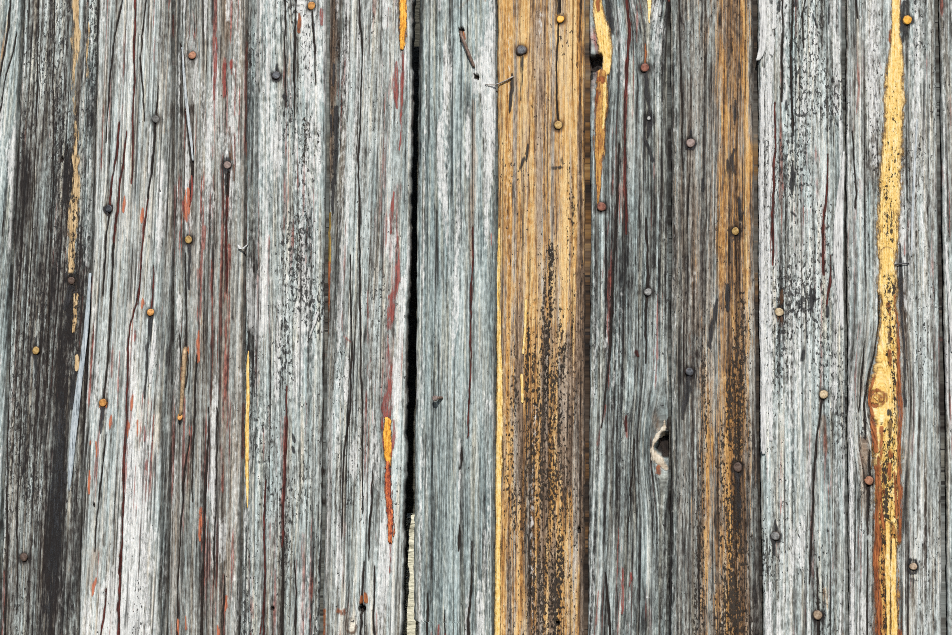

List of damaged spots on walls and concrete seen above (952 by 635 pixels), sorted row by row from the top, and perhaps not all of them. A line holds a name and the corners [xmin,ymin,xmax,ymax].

crack [94,0,159,635]
crack [186,114,194,200]
peeling [494,227,503,635]
peeling [592,0,614,203]
peeling [868,0,906,635]